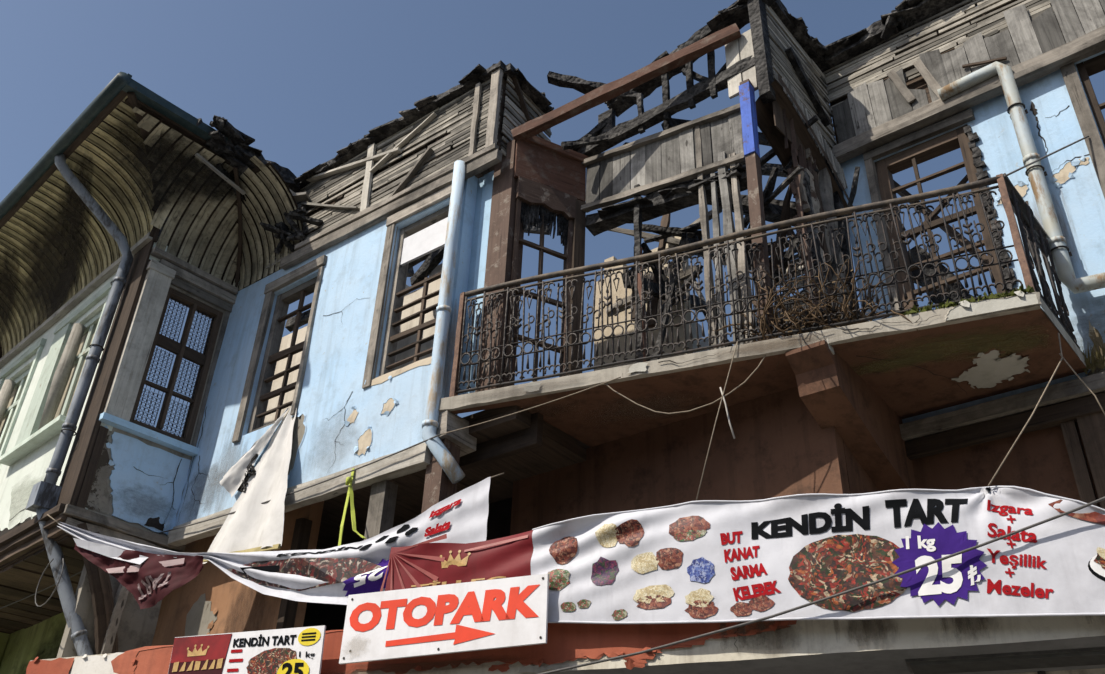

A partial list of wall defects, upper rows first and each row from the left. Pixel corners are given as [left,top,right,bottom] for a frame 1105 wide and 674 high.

crack [1035,105,1089,169]
peeling [1014,181,1029,198]
peeling [1049,155,1089,188]
leakage [48,158,91,317]
leakage [0,252,17,334]
spalling [364,356,432,386]
peeling [949,348,1031,390]
spalling [86,425,114,514]
crack [134,407,210,526]
peeling [353,425,373,457]
peeling [26,645,173,674]
peeling [320,620,797,674]